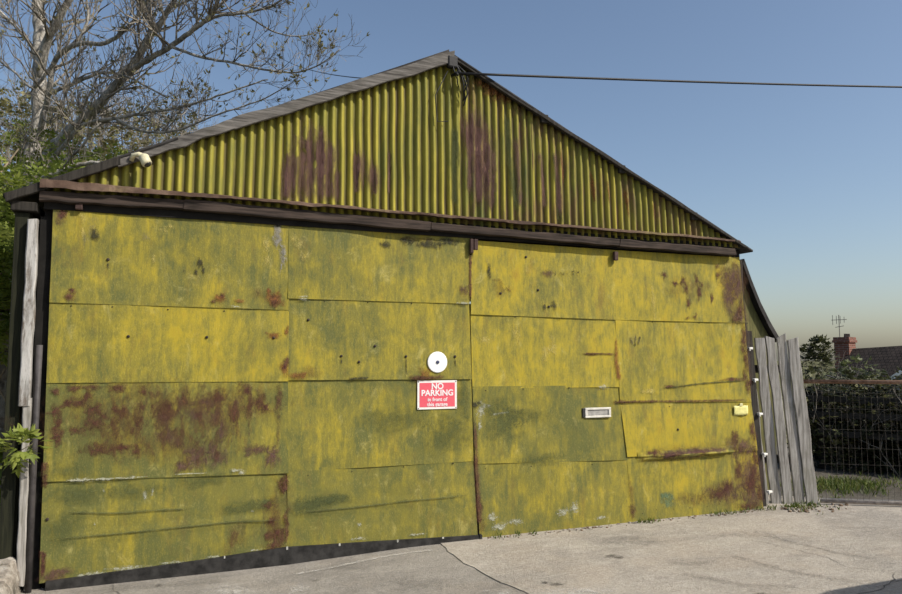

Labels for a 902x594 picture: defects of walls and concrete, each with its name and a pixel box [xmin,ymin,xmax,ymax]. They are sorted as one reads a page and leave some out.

rust [281,130,340,198]
rust [461,115,497,208]
rust [663,272,713,319]
rust [716,264,751,391]
rust [47,384,282,470]
rust [474,428,483,524]
rust [648,423,764,510]